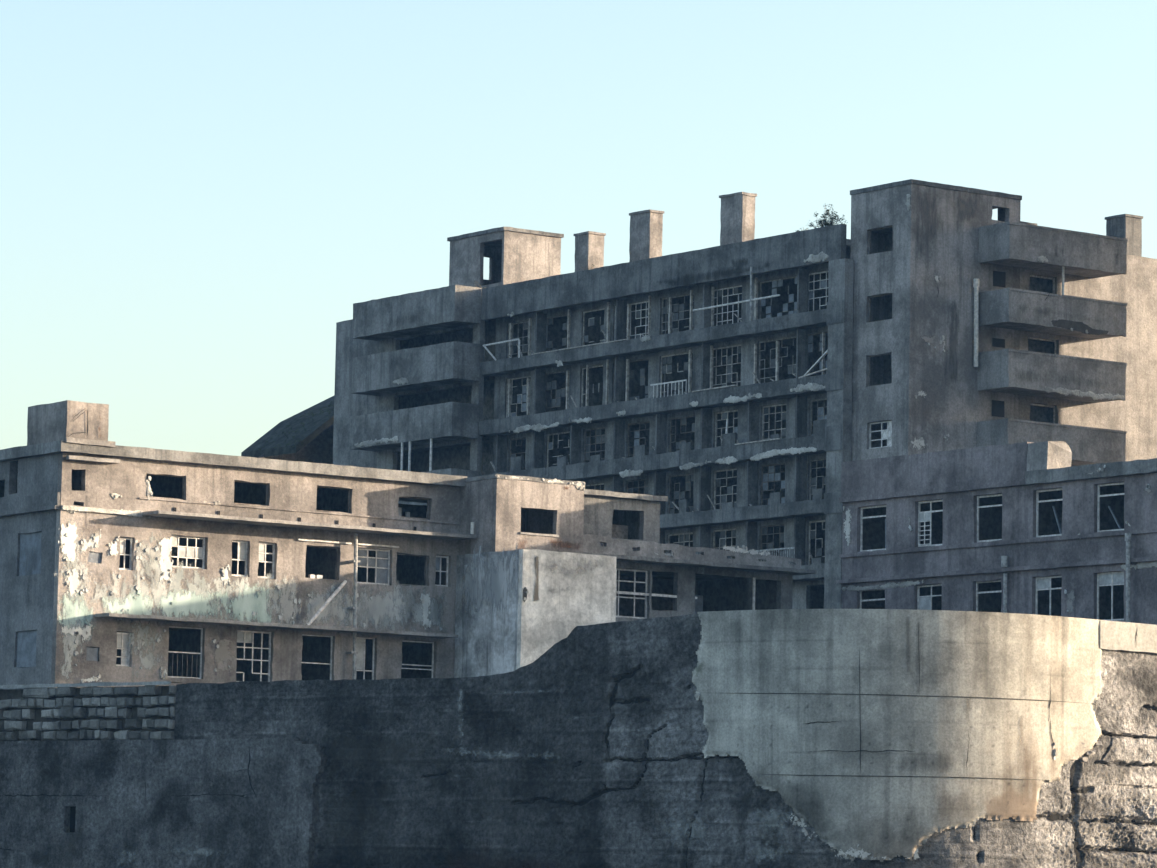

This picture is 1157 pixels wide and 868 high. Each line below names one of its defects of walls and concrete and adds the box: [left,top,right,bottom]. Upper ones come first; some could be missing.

spalling [1043,386,1125,401]
spalling [110,476,153,519]
peeling [58,507,528,683]
crack [518,668,739,868]
crack [1037,673,1157,866]